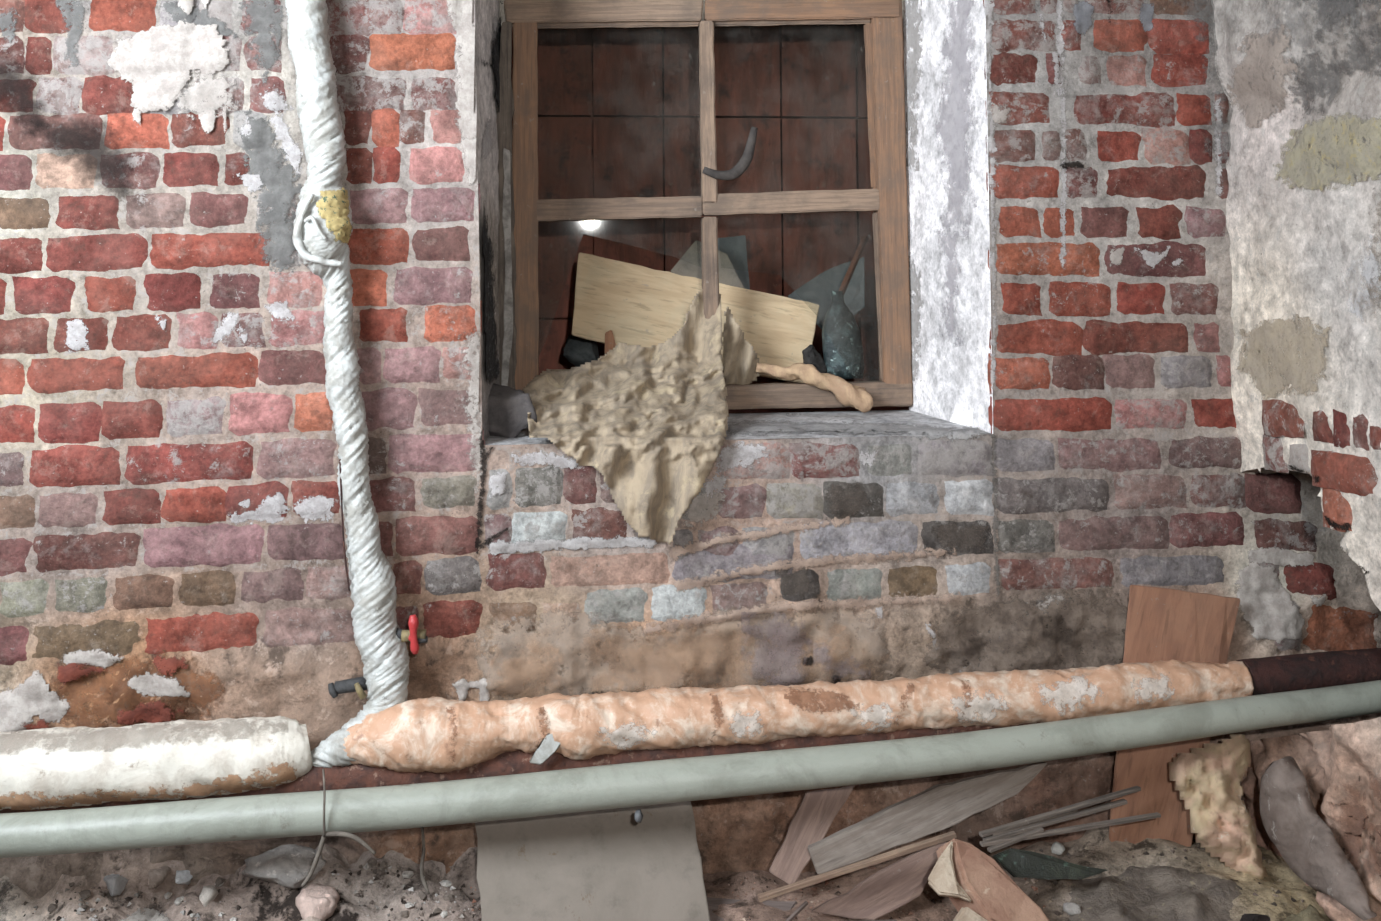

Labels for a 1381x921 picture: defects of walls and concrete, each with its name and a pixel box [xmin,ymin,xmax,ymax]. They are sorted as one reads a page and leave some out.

peeling [107,0,252,138]
peeling [258,85,294,113]
water stain [29,120,128,194]
peeling [236,173,263,193]
peeling [1235,547,1326,644]